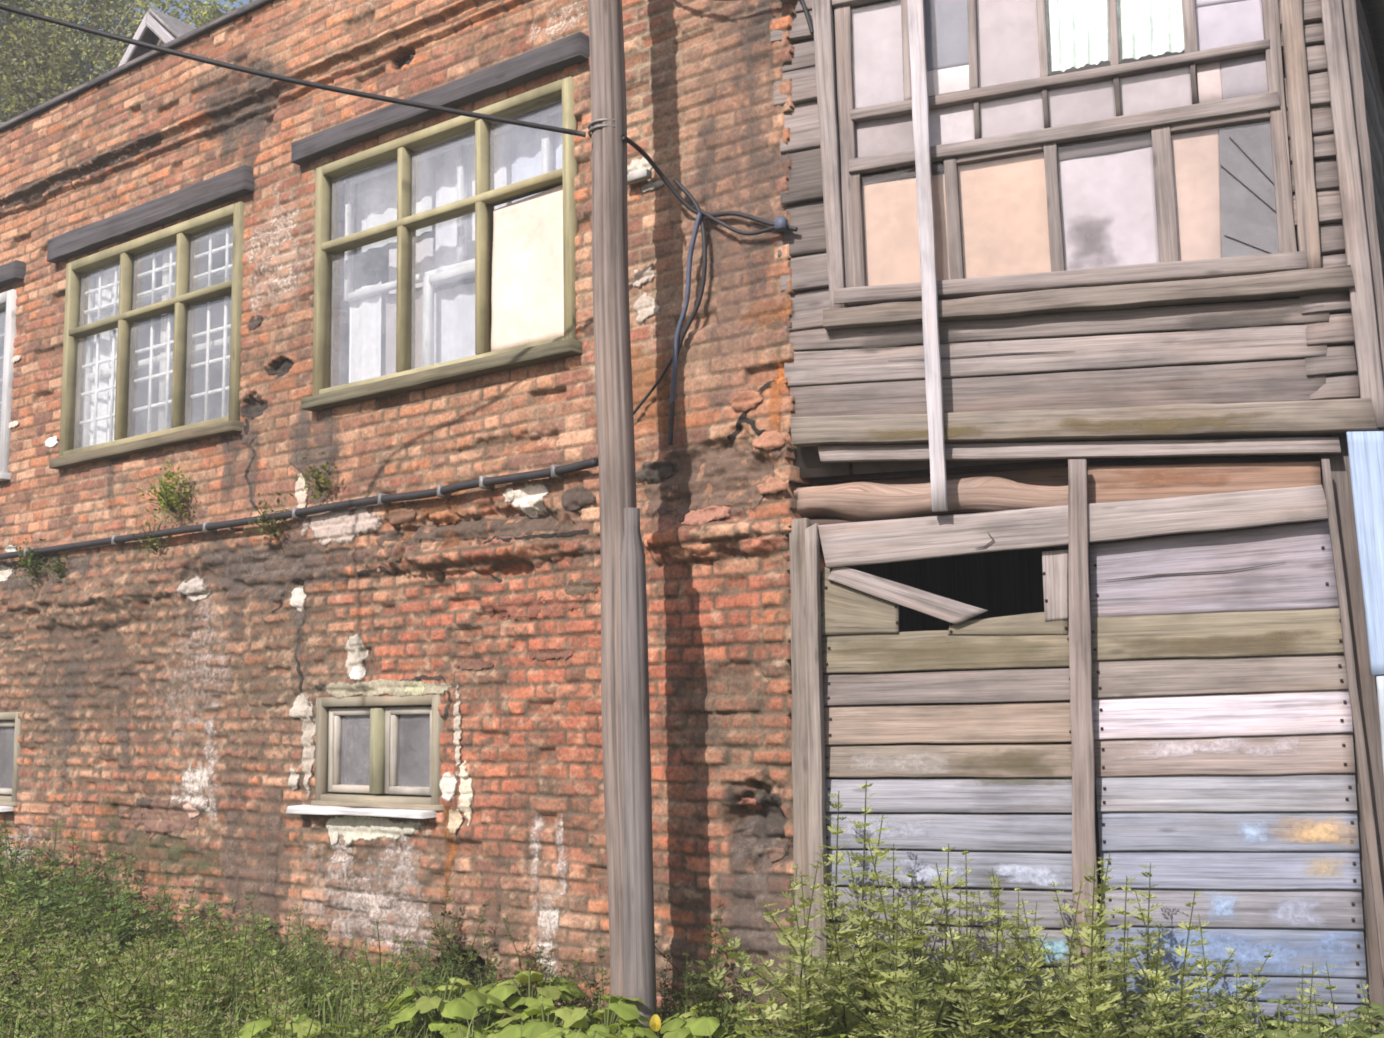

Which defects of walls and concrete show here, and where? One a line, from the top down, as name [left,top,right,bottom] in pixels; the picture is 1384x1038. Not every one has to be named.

spalling [264,358,294,376]
crack [727,376,778,442]
crack [243,418,257,510]
spalling [295,473,595,549]
spalling [636,430,789,526]
leakage [0,552,93,603]
crack [271,559,328,693]
leakage [79,530,362,932]
flaking render [288,693,316,799]
crack [399,675,451,718]
leakage [310,836,430,956]
leakage [718,792,795,1003]